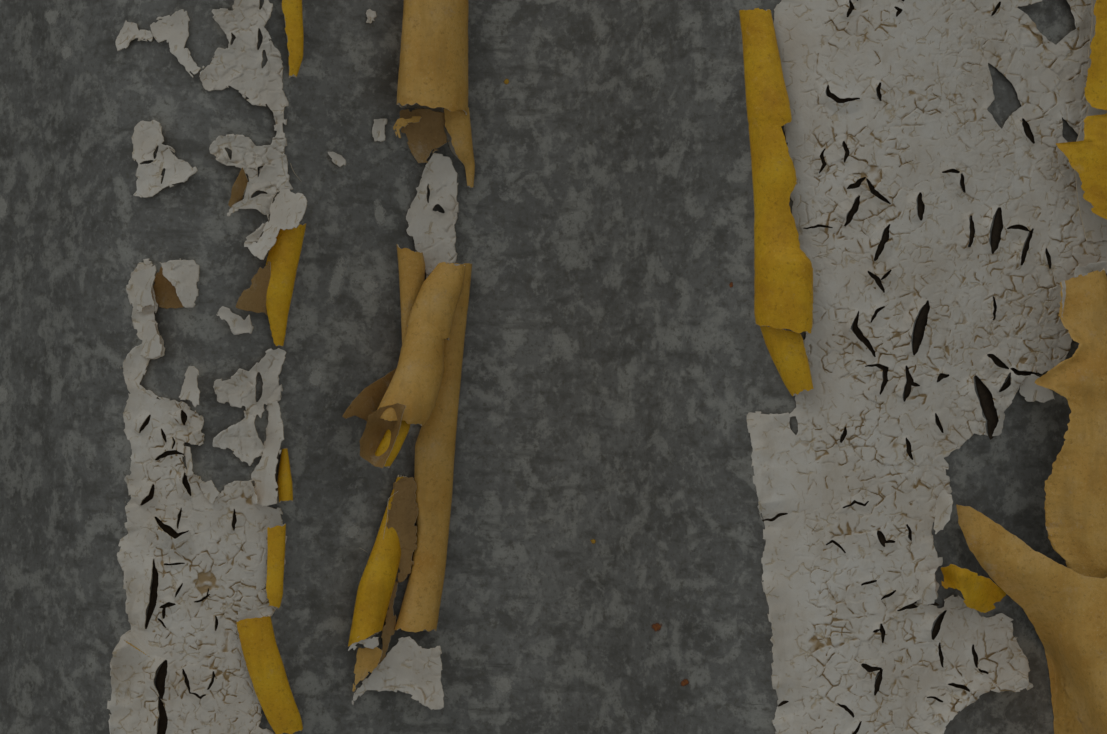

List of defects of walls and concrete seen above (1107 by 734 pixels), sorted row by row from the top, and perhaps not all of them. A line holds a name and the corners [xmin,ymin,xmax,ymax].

peeling [366,9,377,24]
peeling [115,0,307,335]
peeling [372,119,388,142]
peeling [406,128,473,278]
peeling [213,345,287,466]
crack [747,0,1107,734]
crack [107,259,287,734]
peeling [383,404,422,582]
peeling [348,628,444,710]